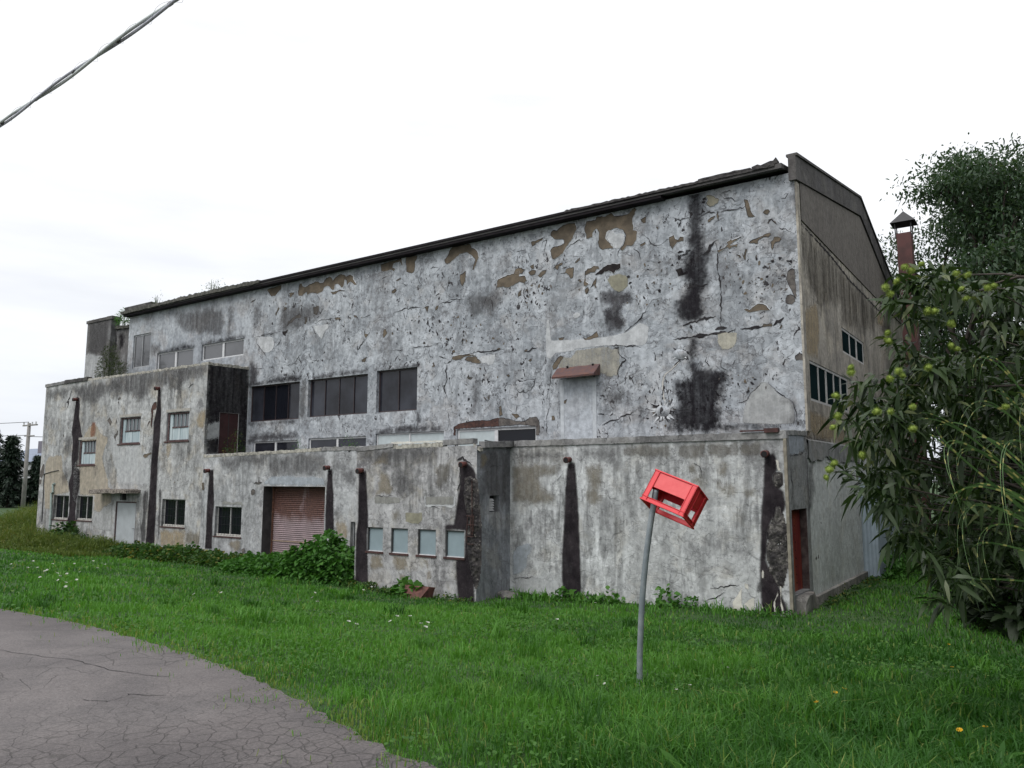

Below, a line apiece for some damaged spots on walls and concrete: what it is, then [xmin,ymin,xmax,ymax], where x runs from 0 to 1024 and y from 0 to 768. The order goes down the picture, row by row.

peeling [260,274,357,336]
peeling [444,244,479,286]
peeling [497,208,688,308]
water stain [602,291,631,331]
water stain [674,193,708,321]
crack [609,190,784,401]
water stain [674,339,732,432]
water stain [51,365,443,584]
water stain [437,453,552,601]
water stain [562,463,600,599]
water stain [680,444,787,614]